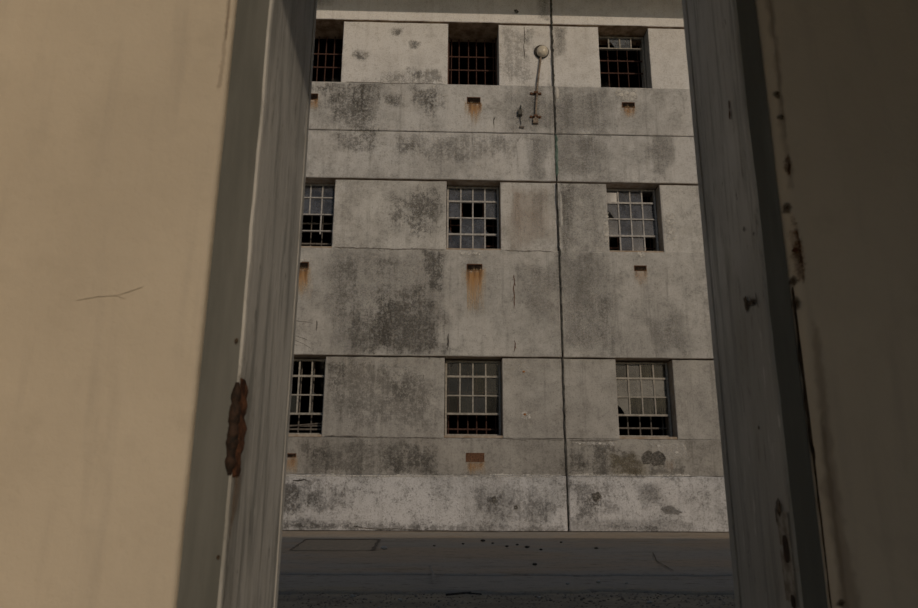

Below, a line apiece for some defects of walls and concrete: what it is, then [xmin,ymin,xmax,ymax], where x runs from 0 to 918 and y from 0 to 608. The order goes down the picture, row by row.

rust [792,223,805,281]
rust [466,269,484,303]